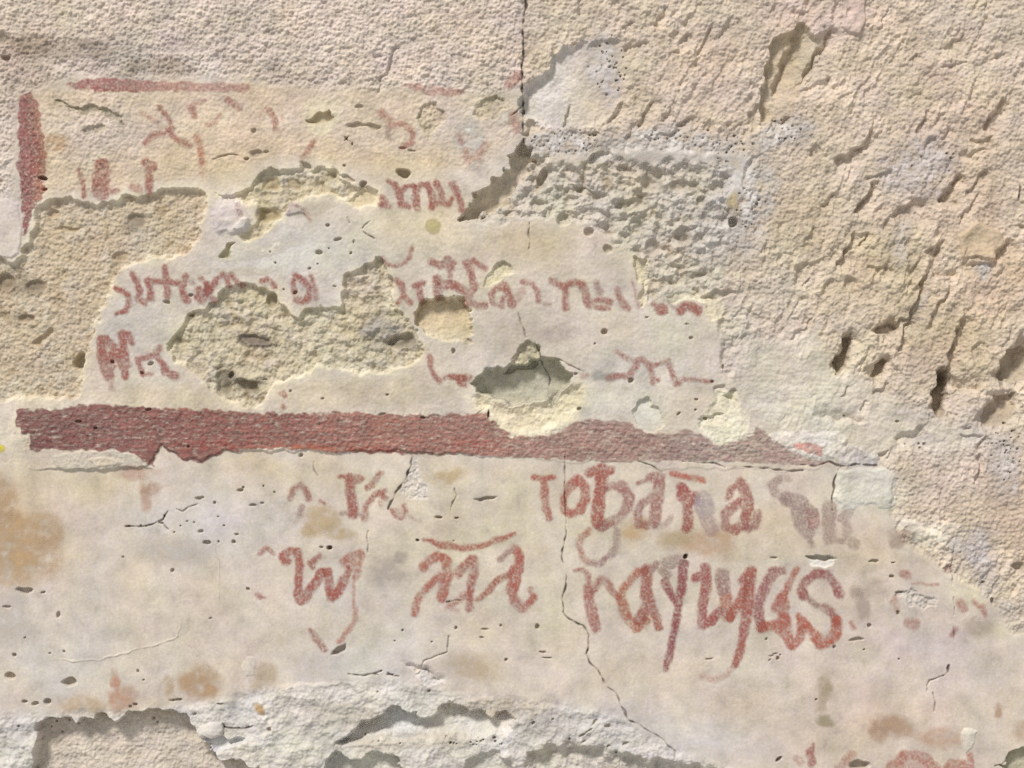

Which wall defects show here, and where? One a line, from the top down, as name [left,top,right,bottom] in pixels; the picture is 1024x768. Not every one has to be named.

crack [520,0,528,127]
spalling [758,20,840,124]
spalling [0,159,381,405]
spalling [163,255,475,411]
spalling [467,337,590,440]
spalling [456,137,743,323]
spalling [693,380,752,448]
spalling [830,317,913,386]
spalling [929,313,975,420]
spalling [973,337,1024,447]
spalling [21,698,262,768]
spalling [323,697,718,768]